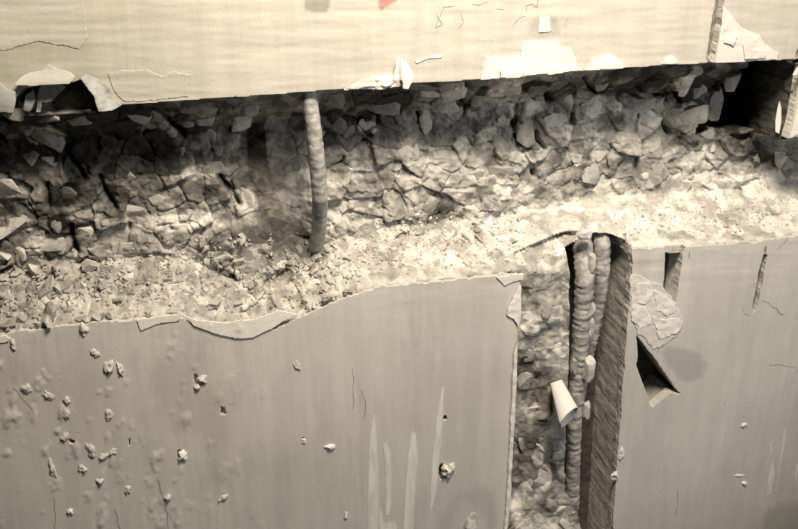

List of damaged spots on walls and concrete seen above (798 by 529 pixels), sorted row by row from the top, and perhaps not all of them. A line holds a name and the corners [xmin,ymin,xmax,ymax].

spalling [0,0,798,349]
damp [368,416,418,529]
damp [430,387,444,514]
spalling [496,251,581,529]
spalling [636,337,675,401]